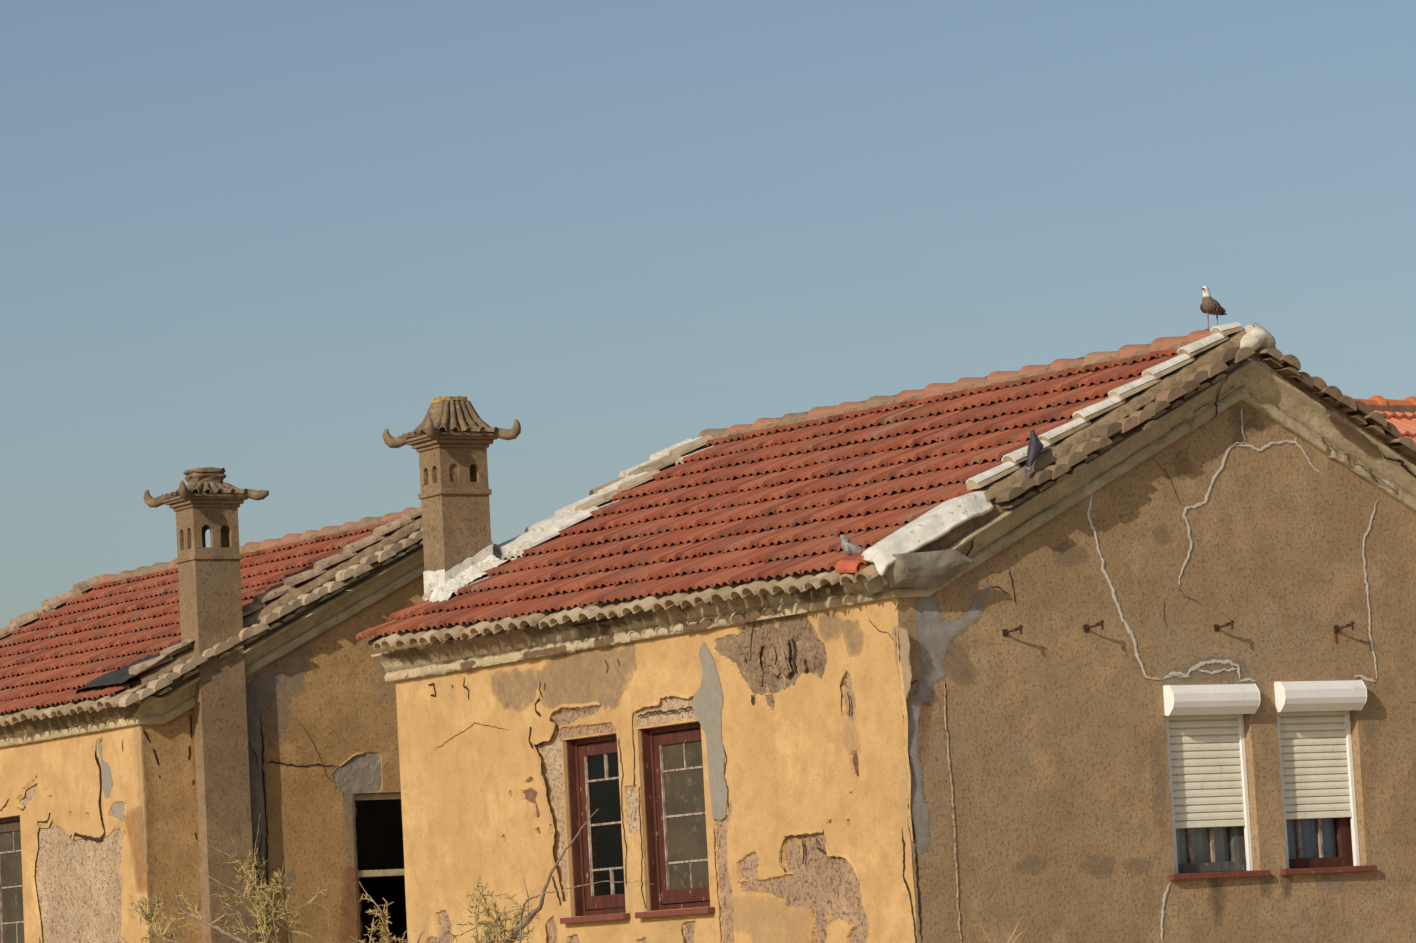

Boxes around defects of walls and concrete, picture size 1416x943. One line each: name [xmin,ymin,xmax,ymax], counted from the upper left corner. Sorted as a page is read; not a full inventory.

crack [1087,375,1416,682]
flaking render [390,593,868,710]
flaking render [839,670,856,720]
peeling [892,626,912,698]
flaking render [1,775,38,812]
flaking render [29,802,128,943]
crack [70,715,194,844]
crack [249,714,334,940]
flaking render [712,805,869,943]